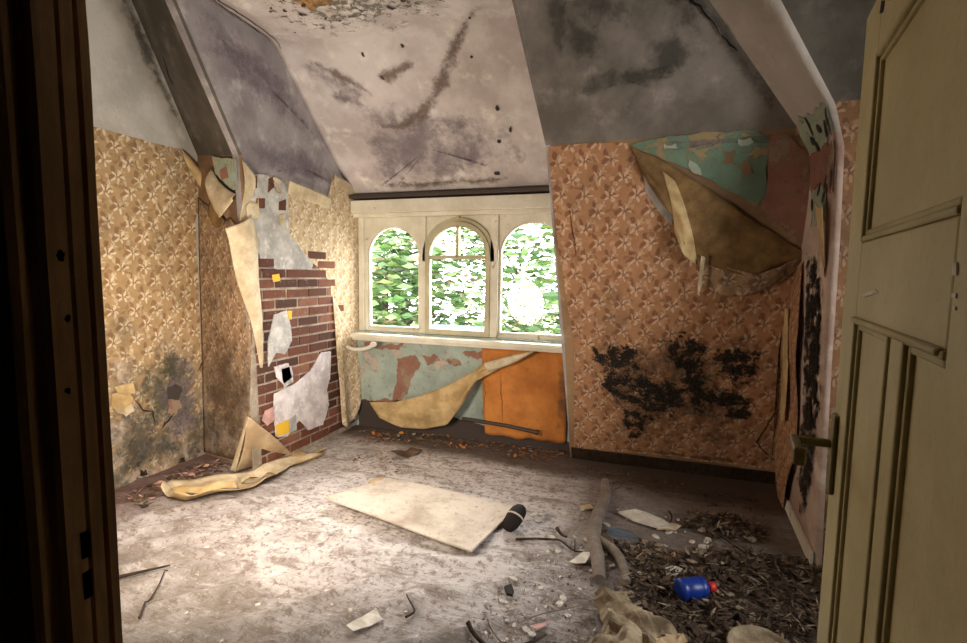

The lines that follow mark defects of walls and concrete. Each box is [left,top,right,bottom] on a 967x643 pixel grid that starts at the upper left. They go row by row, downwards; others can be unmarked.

water stain [318,65,365,90]
water stain [373,24,482,187]
peeling [212,156,238,190]
peeling [629,102,834,278]
water stain [125,353,191,477]
flaking render [246,174,355,471]
peeling [364,342,482,402]
water stain [591,331,762,461]
mould [797,252,823,519]